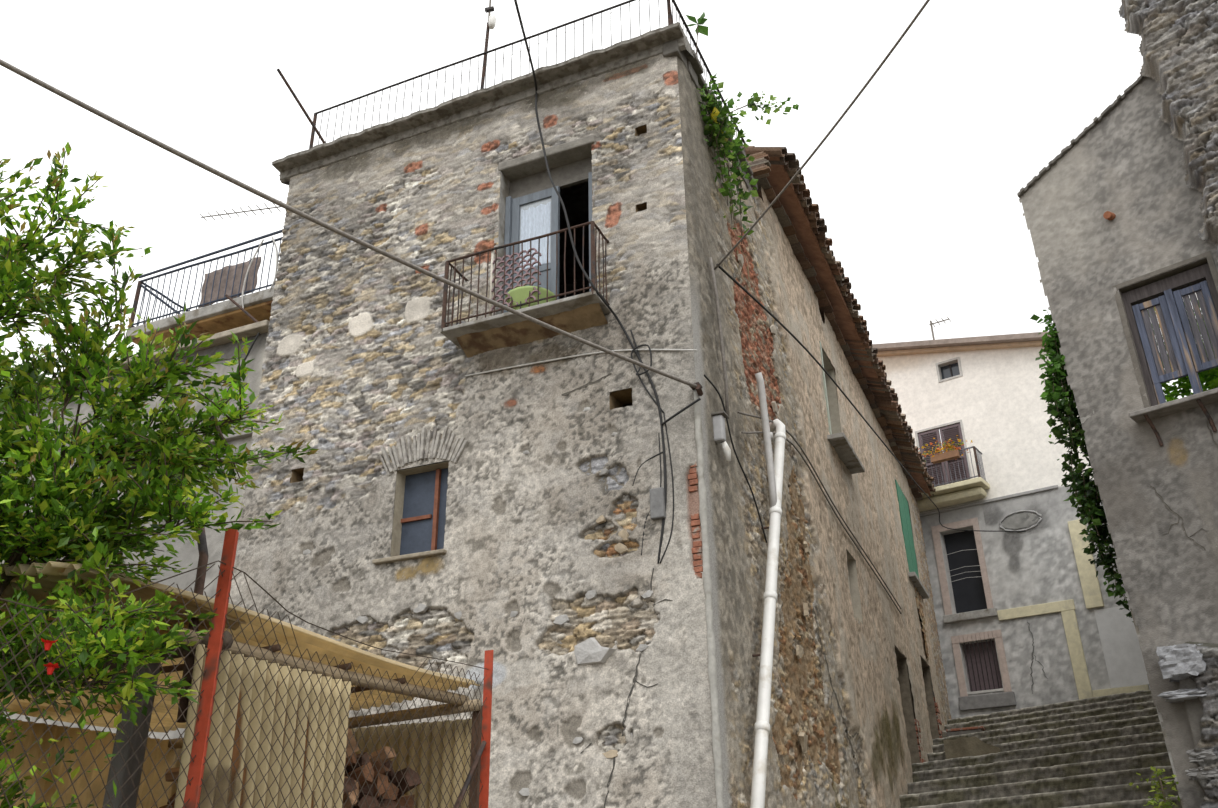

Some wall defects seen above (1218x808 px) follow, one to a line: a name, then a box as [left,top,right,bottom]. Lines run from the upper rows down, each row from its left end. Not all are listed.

spalling [727,221,781,432]
spalling [579,456,639,558]
flaking render [688,461,698,492]
flaking render [691,514,703,578]
spalling [331,603,475,672]
spalling [538,588,660,665]